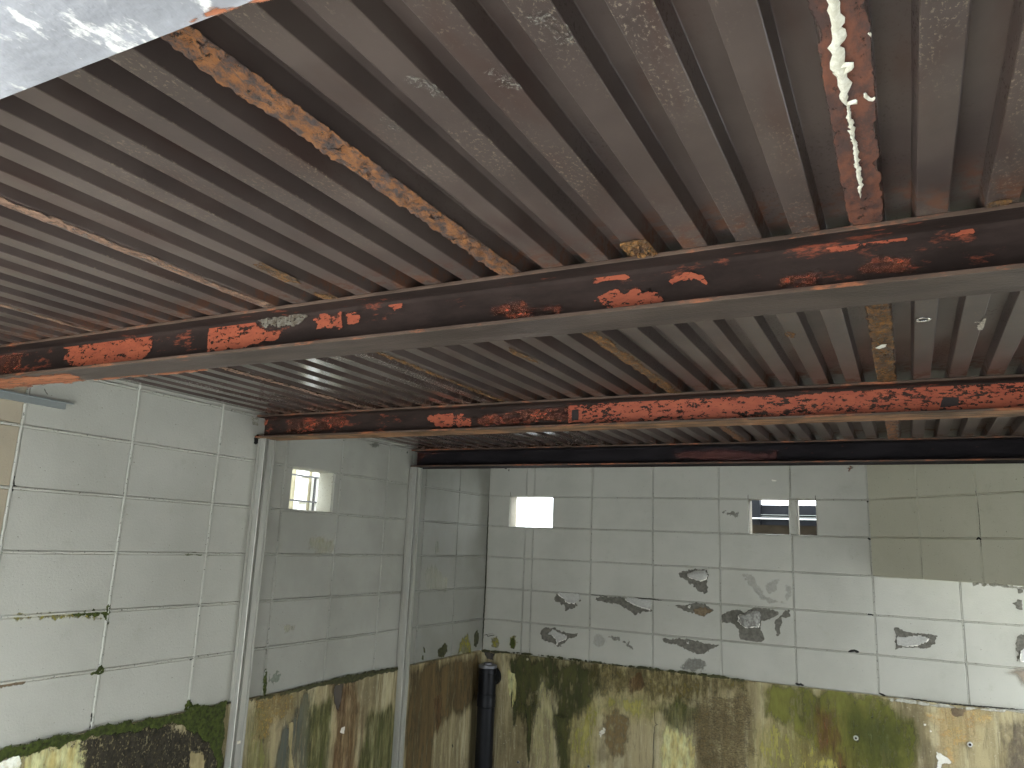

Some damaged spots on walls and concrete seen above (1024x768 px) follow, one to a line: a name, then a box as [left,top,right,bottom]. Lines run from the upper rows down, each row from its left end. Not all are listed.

damp [827,0,876,198]
rust [620,240,658,258]
rust [254,263,301,284]
rust [0,369,206,389]
peeling [596,596,652,615]
peeling [663,638,719,654]
peeling [676,602,790,642]
peeling [894,627,938,650]
damp [25,723,225,768]
damp [247,692,312,768]
damp [508,654,601,768]
damp [765,684,918,768]